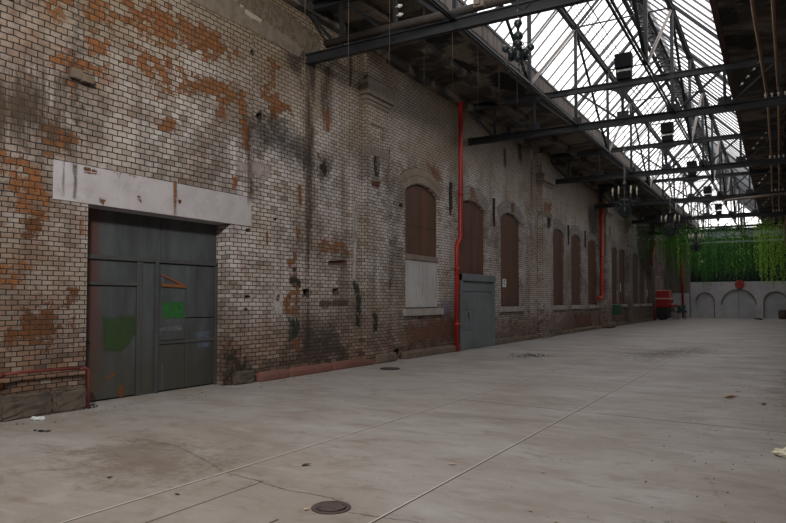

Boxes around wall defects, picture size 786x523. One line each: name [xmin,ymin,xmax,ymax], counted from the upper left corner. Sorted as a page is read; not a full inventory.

spalling [22,0,293,149]
spalling [0,116,84,238]
water stain [296,64,331,265]
spalling [3,300,77,355]